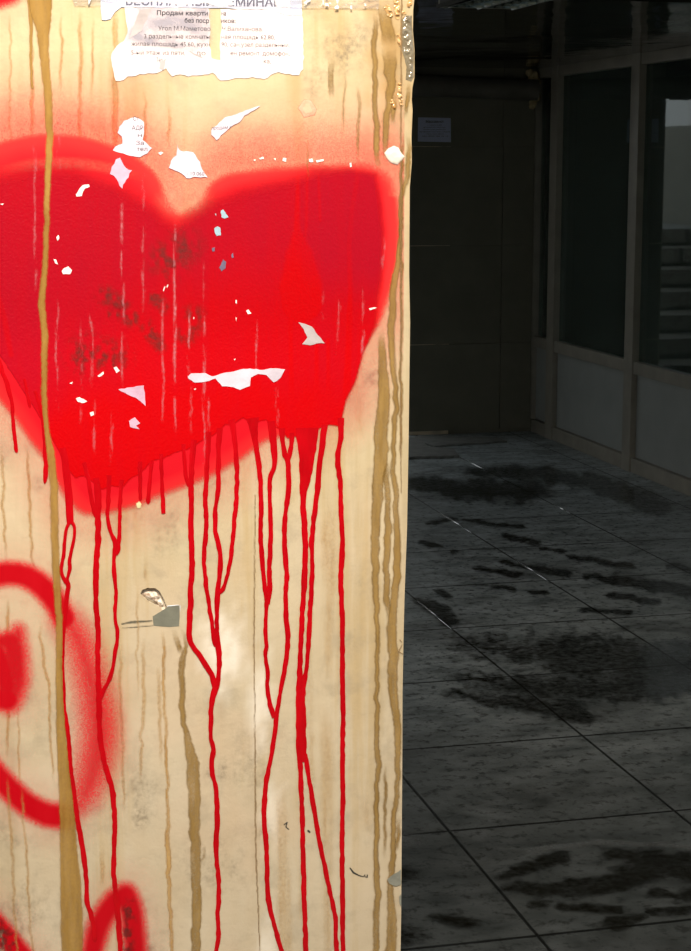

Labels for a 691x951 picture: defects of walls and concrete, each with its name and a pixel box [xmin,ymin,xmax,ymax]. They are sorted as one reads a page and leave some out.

damp [371,0,412,156]
damp [371,147,691,951]